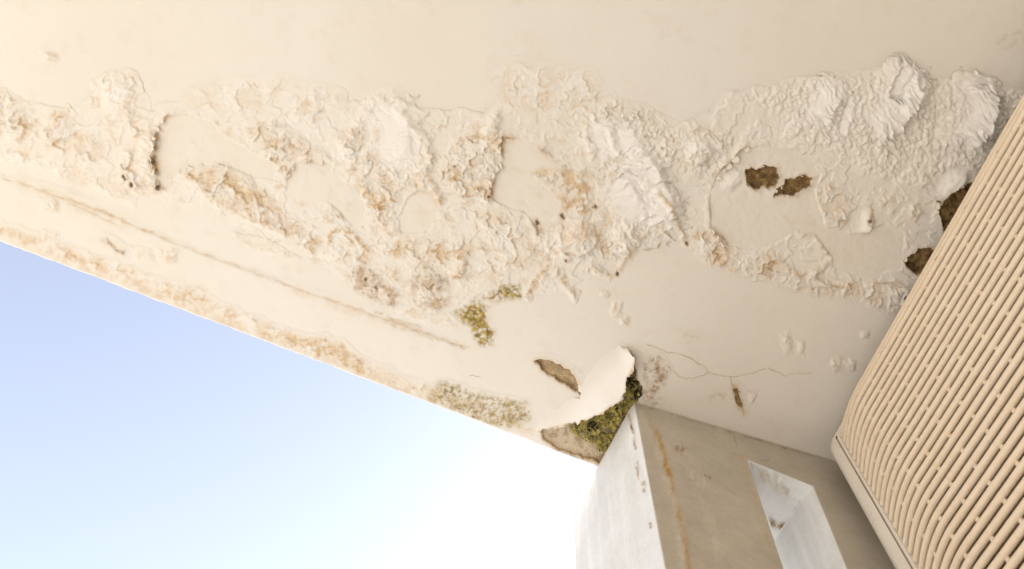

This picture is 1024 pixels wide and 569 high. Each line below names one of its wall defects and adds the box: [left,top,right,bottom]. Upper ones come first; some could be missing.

peeling [0,87,621,330]
peeling [685,66,1024,315]
damp [431,377,535,432]
spalling [531,395,648,495]
spalling [613,341,640,381]
crack [647,344,812,450]